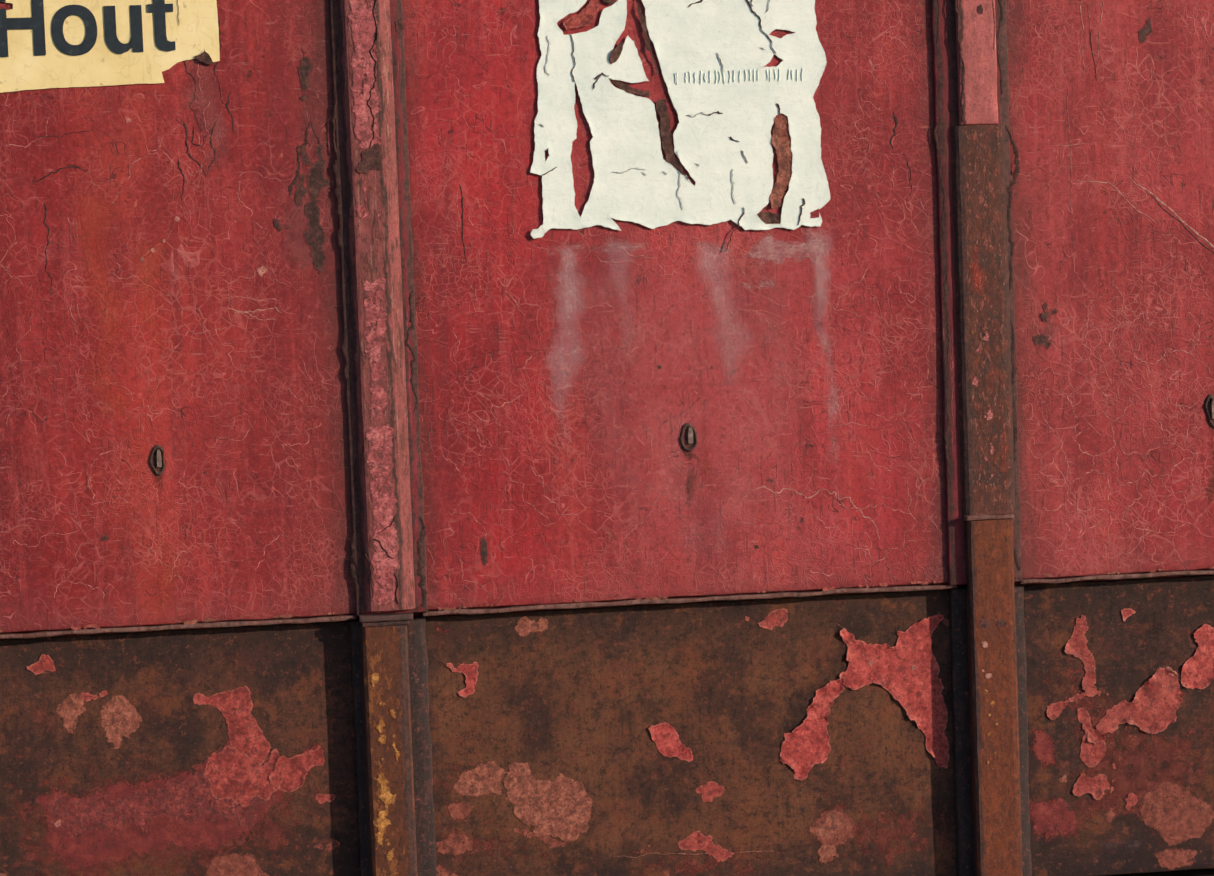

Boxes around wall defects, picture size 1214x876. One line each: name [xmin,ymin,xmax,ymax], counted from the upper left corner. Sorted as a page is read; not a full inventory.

crack [111,18,235,205]
crack [237,0,378,403]
peeling [347,0,382,154]
crack [996,0,1004,94]
crack [1005,125,1204,559]
peeling [362,276,399,607]
crack [351,446,487,608]
peeling [35,686,325,876]
corrosion [436,864,458,876]
peeling [436,761,593,856]
peeling [780,614,950,781]
peeling [1029,615,1214,870]